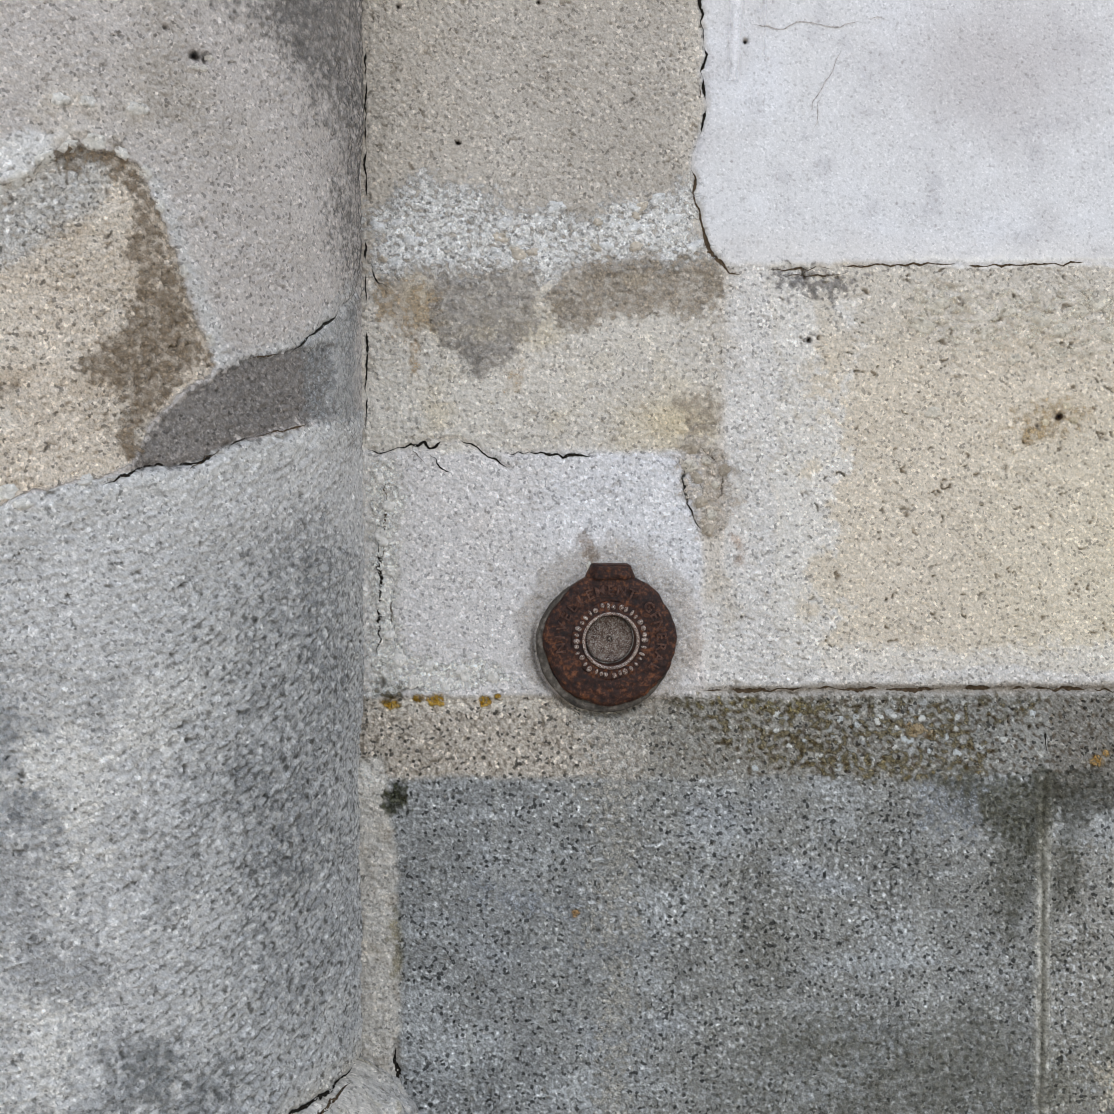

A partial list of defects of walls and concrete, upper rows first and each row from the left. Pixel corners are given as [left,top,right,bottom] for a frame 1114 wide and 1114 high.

crack [754,16,884,133]
spalling [0,133,216,511]
crack [243,54,592,472]
damp [428,242,725,380]
crack [106,422,309,484]
damp [673,391,721,430]
crack [376,481,395,654]
crack [289,1063,355,1114]